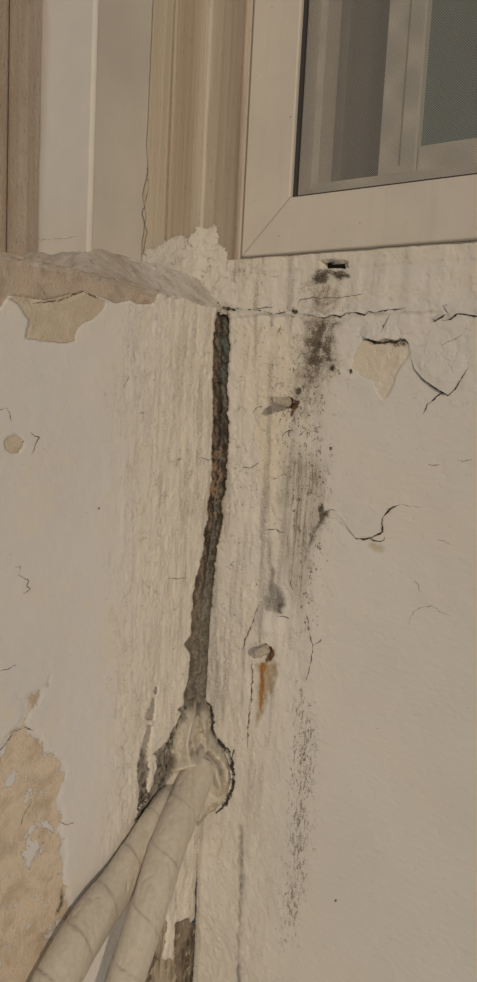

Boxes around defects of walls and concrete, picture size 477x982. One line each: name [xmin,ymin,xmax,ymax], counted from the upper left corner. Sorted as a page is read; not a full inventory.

spalling [0,251,161,343]
leakage [306,321,352,382]
leakage [312,269,349,284]
peeling [353,315,410,399]
crack [432,297,477,345]
crack [169,294,405,814]
crack [326,504,420,542]
corrosion [247,649,276,745]
spalling [0,683,73,982]
spalling [145,918,195,982]